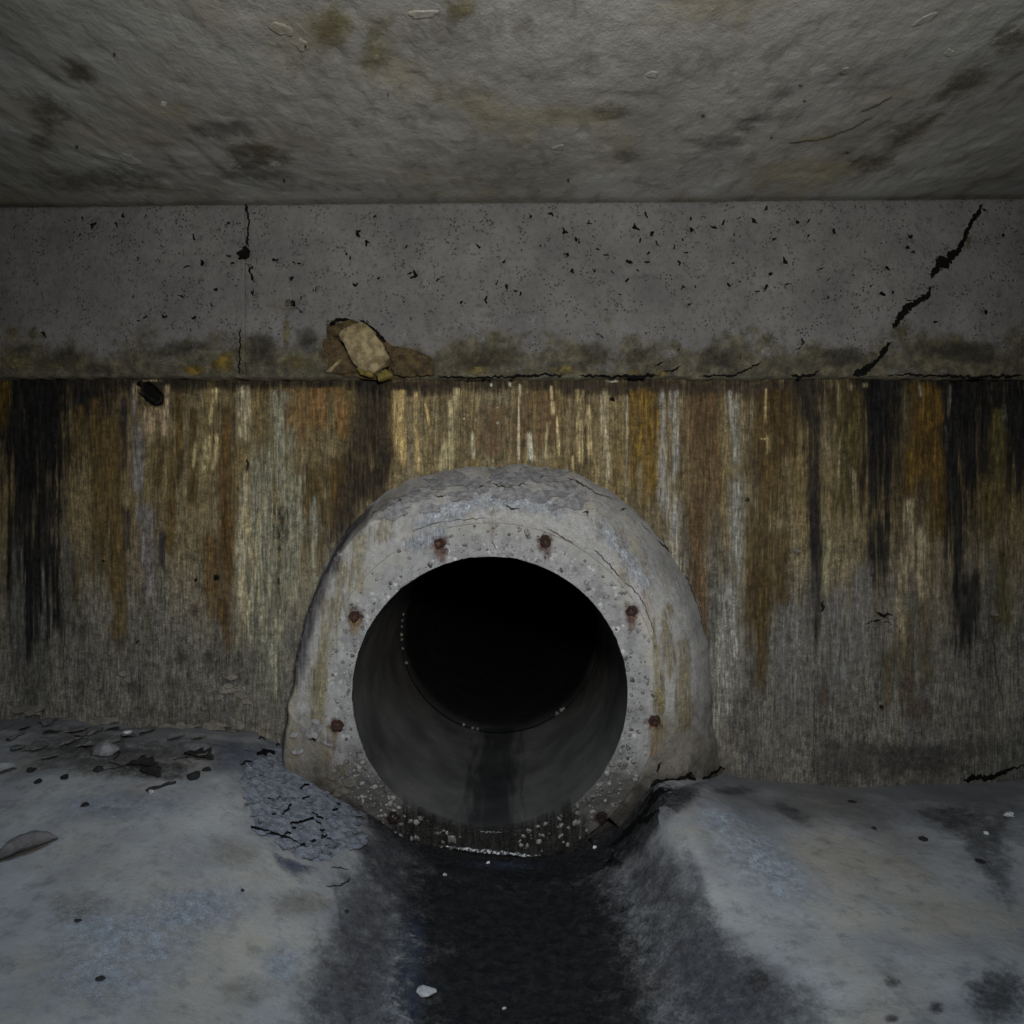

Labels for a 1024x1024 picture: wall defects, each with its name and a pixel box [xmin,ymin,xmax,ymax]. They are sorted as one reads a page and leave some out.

spalling [322,318,436,382]
crack [439,361,760,380]
crack [853,204,1022,380]
water stain [0,370,1024,736]
water stain [46,741,192,779]
spalling [239,523,627,862]
water stain [310,783,802,1024]
spalling [518,616,658,852]
crack [608,762,725,847]
rust [650,606,690,746]
water stain [922,807,1008,886]
crack [963,764,1024,783]